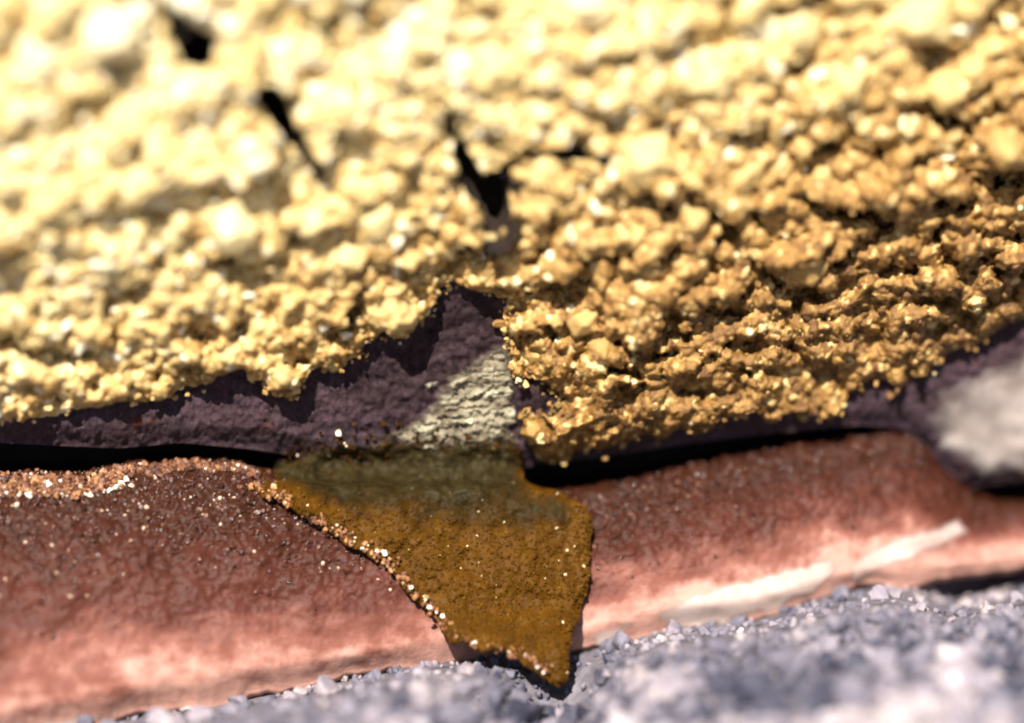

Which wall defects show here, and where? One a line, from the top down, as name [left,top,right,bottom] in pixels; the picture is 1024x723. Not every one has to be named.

crack [252,73,332,190]
crack [441,113,611,254]
peeling [944,365,1024,467]